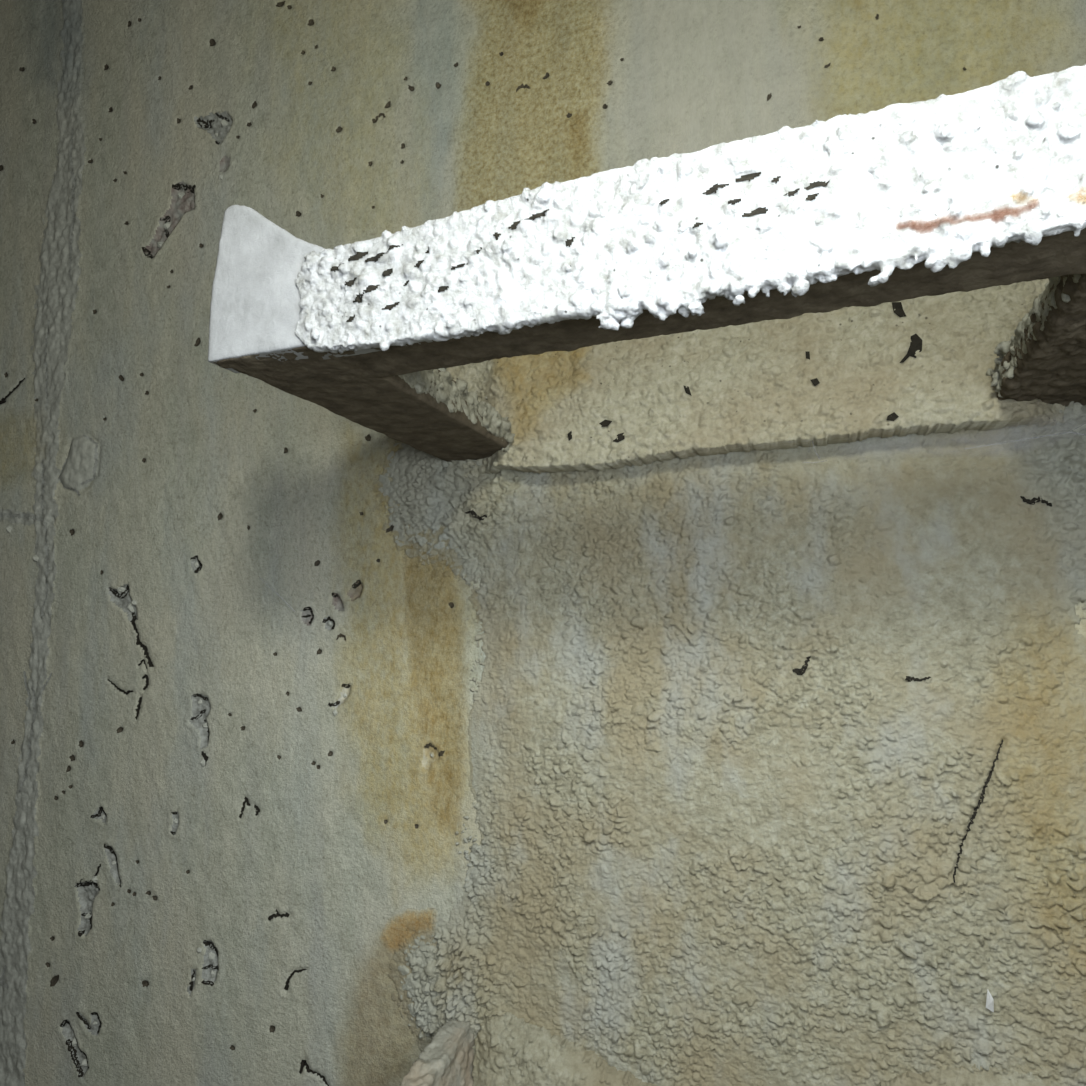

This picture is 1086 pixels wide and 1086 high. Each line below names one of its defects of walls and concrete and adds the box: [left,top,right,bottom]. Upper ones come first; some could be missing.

spalling [194,111,233,180]
spalling [142,181,196,259]
leakage [295,64,1086,354]
crack [108,612,154,720]
spalling [189,693,211,767]
crack [953,739,1003,883]
spalling [74,844,121,937]
spalling [60,1012,102,1079]